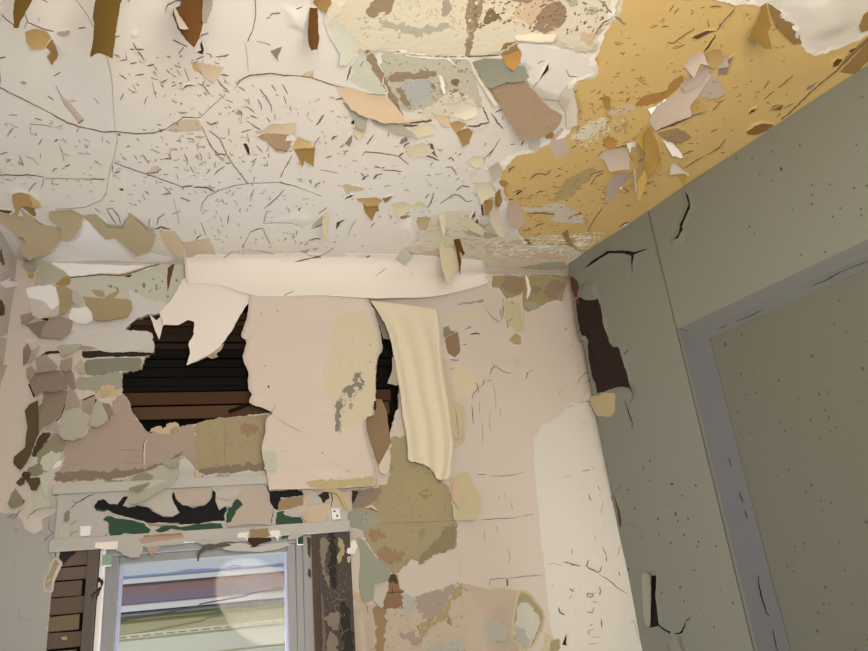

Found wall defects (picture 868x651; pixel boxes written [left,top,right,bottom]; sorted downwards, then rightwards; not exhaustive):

peeling [25,28,73,65]
peeling [192,62,223,82]
peeling [165,117,205,133]
peeling [254,124,315,167]
peeling [313,0,868,417]
crack [70,264,175,292]
crack [0,300,8,316]
flaking render [0,188,480,651]
flaking render [511,590,561,651]
peeling [642,573,651,627]